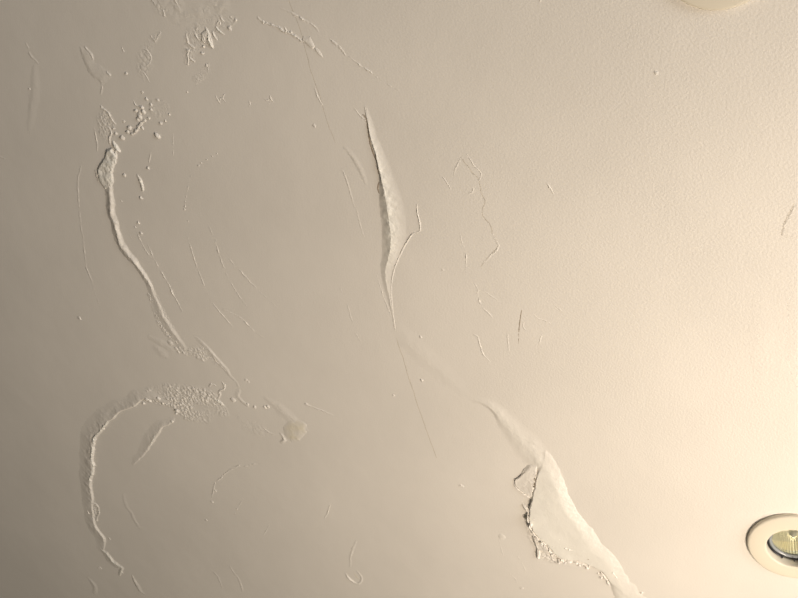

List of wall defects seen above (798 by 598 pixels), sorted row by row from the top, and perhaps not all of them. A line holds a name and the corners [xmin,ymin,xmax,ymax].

peeling [95,105,241,390]
peeling [79,382,222,595]